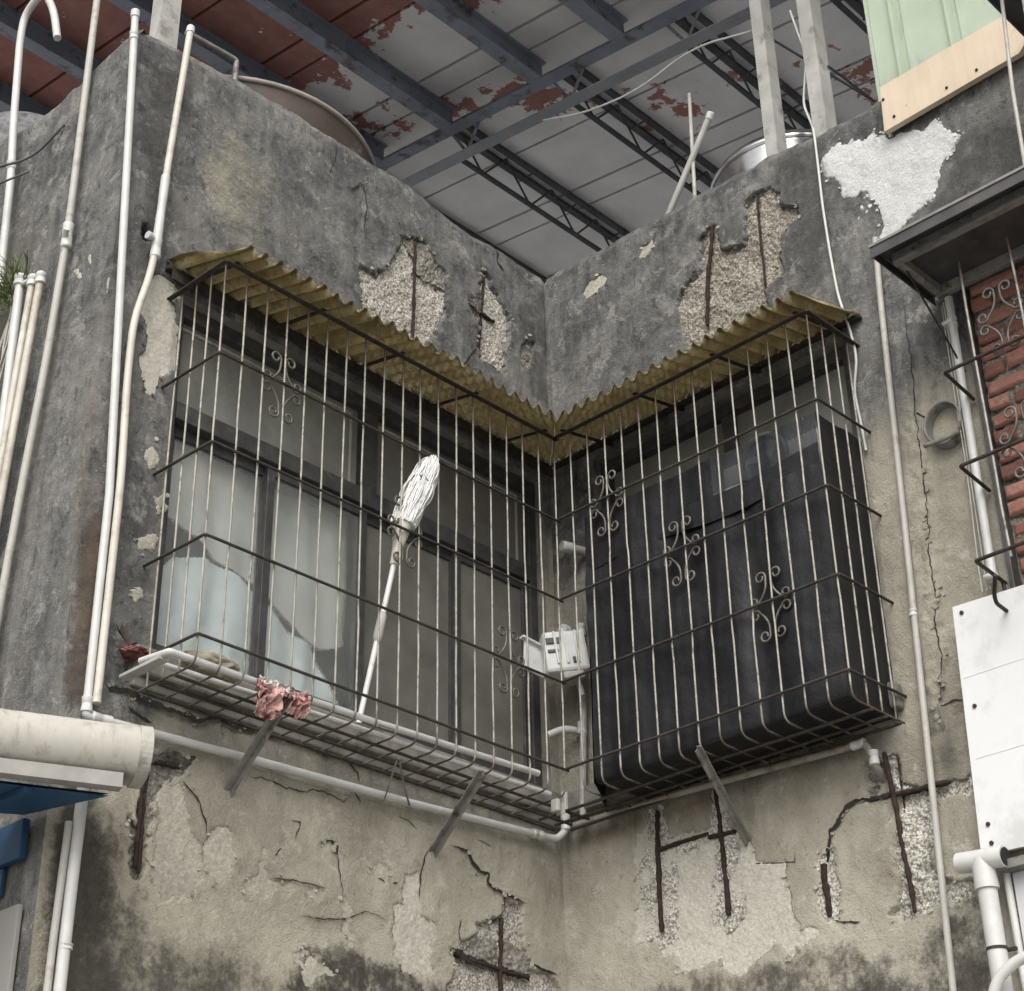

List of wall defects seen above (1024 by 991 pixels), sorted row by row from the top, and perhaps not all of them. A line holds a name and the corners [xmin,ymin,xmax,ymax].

peeling [820,118,965,240]
peeling [138,271,182,397]
spalling [357,236,450,352]
spalling [678,187,801,350]
crack [107,682,285,744]
peeling [124,751,237,902]
crack [253,750,361,802]
crack [275,820,343,889]
crack [307,911,384,920]
crack [453,840,527,924]
peeling [633,786,843,976]
spalling [858,751,976,923]